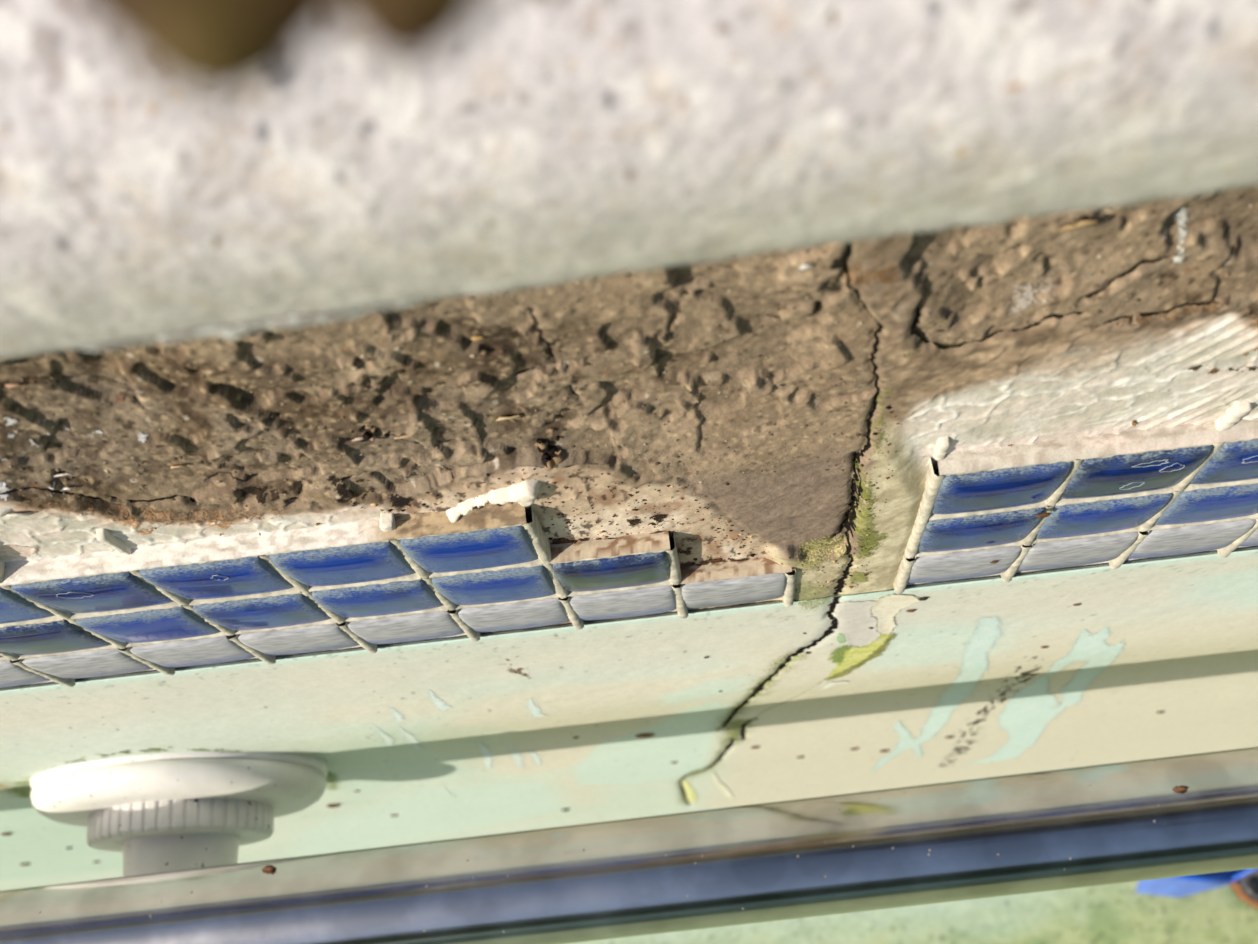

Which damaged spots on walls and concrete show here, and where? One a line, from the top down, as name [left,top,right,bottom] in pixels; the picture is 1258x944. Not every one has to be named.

crack [0,472,254,505]
spalling [0,185,1258,577]
crack [679,244,1219,805]